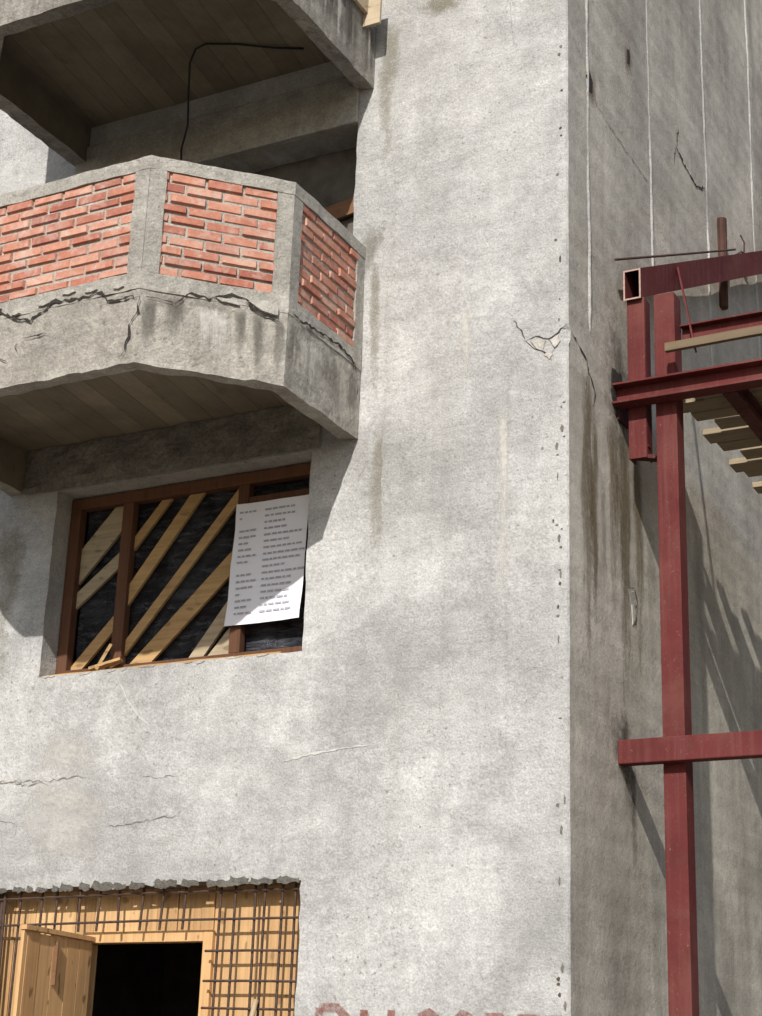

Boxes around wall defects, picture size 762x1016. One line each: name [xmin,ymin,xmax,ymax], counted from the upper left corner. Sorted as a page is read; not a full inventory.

crack [674,128,705,191]
leakage [143,301,155,324]
leakage [200,310,261,351]
spalling [215,297,279,318]
leakage [276,323,337,387]
crack [514,321,596,407]
leakage [582,389,598,587]
leakage [610,428,643,609]